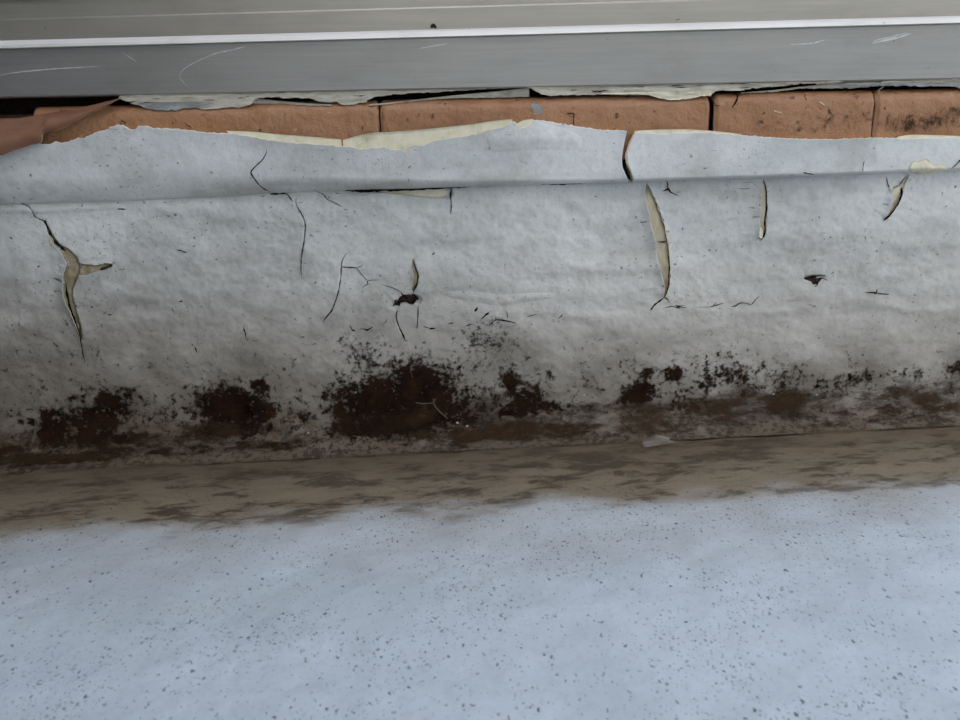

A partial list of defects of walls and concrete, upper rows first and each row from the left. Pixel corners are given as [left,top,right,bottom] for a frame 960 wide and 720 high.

peeling [0,98,121,155]
crack [250,150,306,279]
peeling [227,119,533,151]
crack [622,145,630,180]
peeling [752,181,768,241]
peeling [882,159,948,221]
crack [21,203,113,362]
crack [323,252,371,321]
water stain [0,317,960,466]